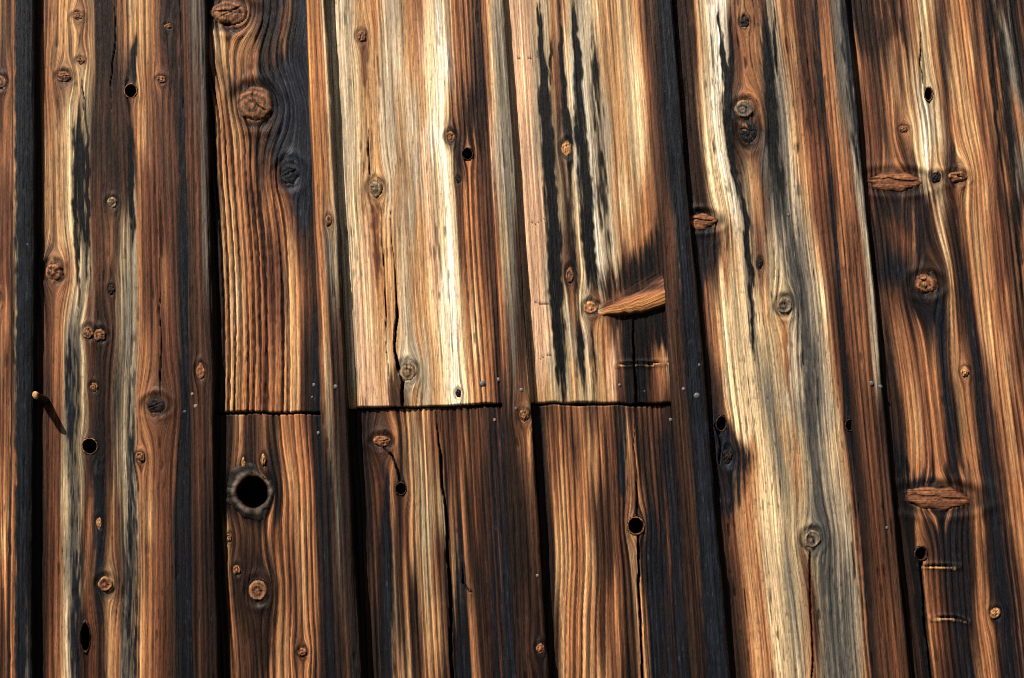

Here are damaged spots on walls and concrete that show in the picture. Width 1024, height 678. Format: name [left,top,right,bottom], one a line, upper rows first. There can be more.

crack [381,210,405,406]
crack [382,447,401,482]
crack [435,412,472,678]
crack [620,321,669,678]
crack [807,552,815,678]